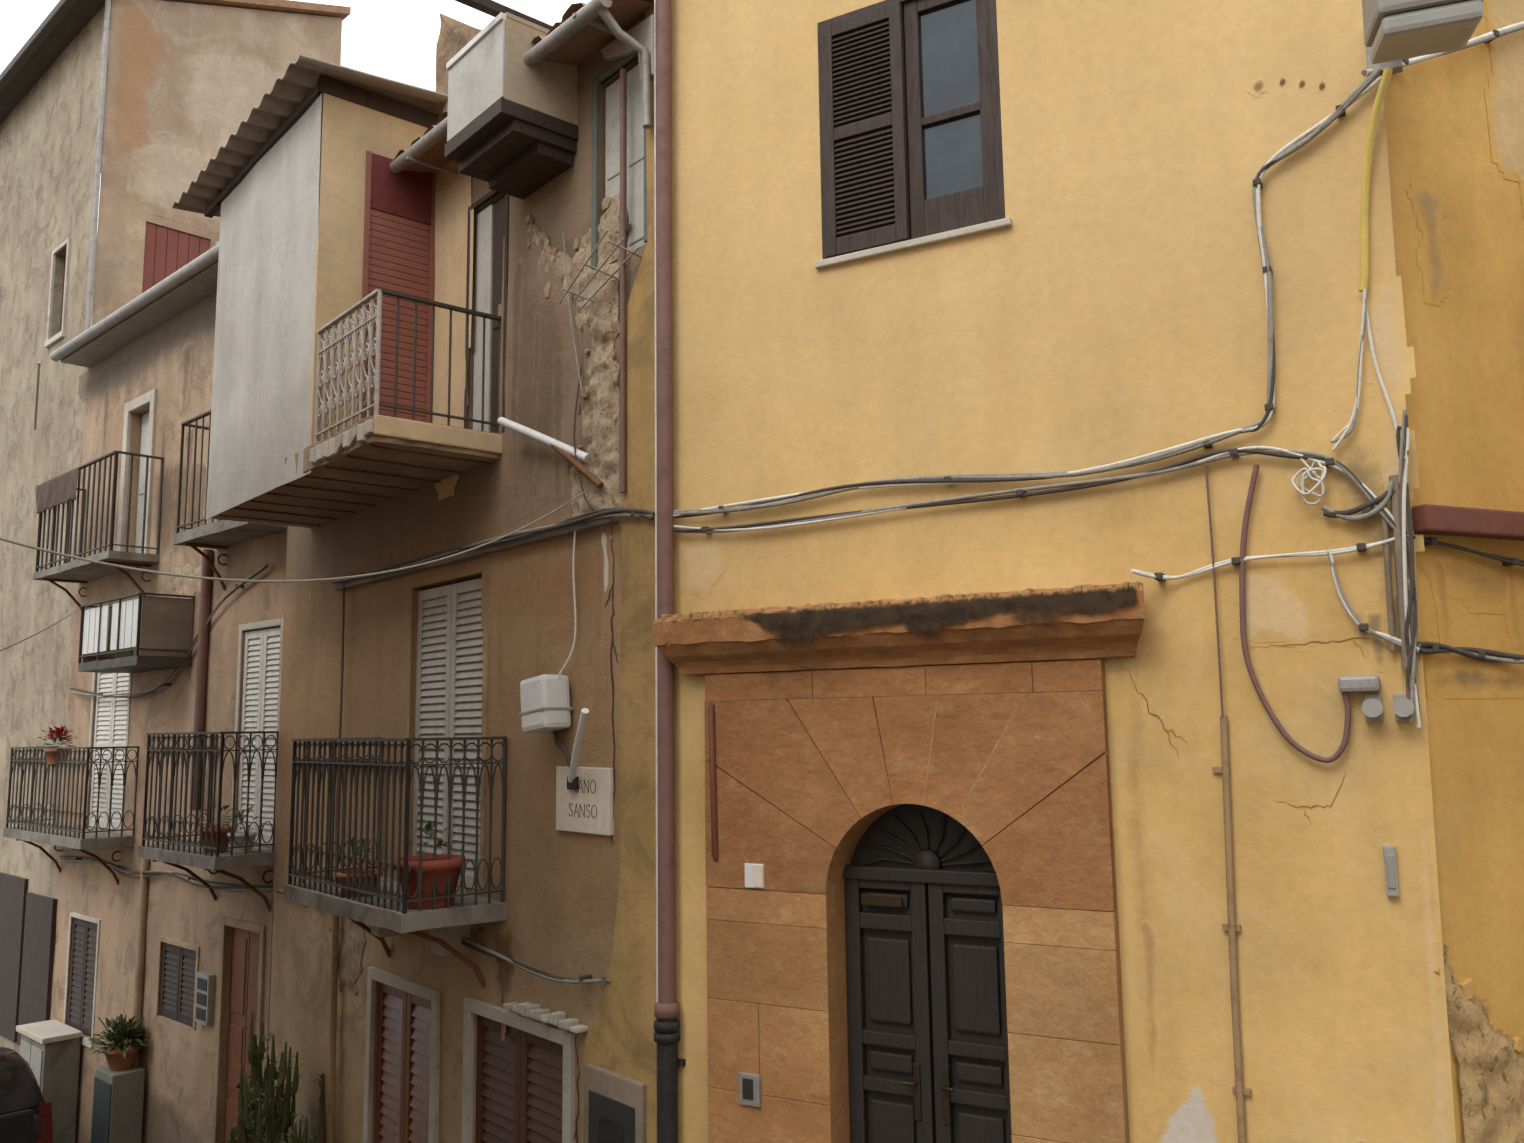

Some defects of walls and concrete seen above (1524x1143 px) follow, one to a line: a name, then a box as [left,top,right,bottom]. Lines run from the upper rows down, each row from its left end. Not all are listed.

flaking render [1482,0,1524,217]
crack [1121,661,1188,753]
flaking render [1433,945,1524,1143]